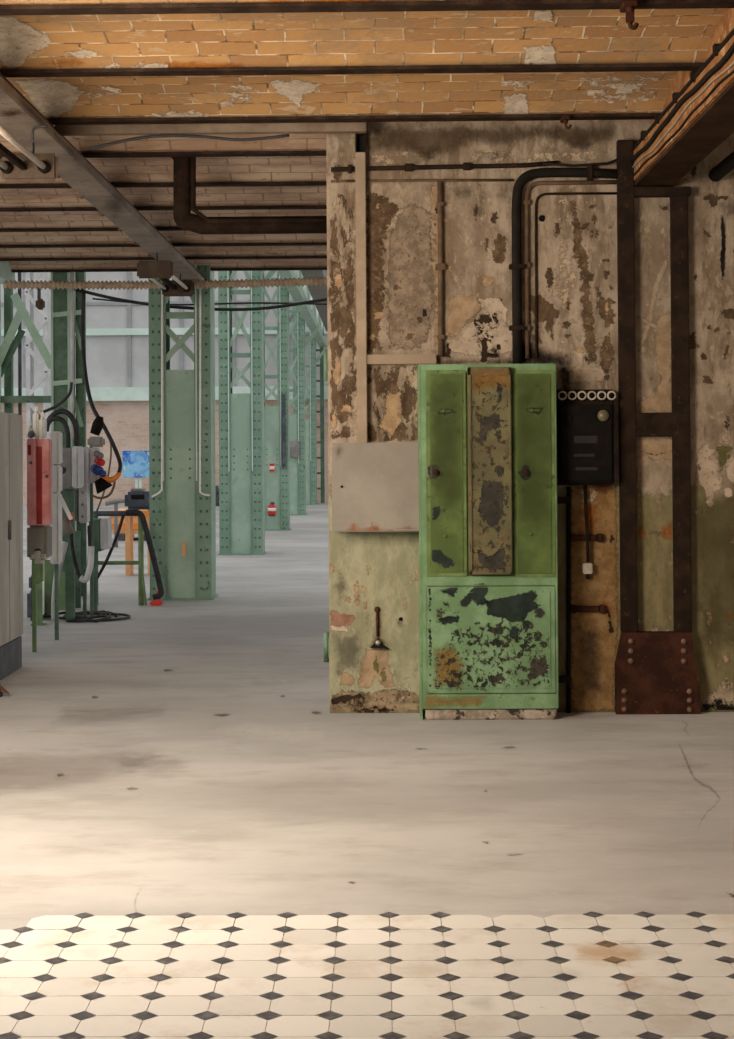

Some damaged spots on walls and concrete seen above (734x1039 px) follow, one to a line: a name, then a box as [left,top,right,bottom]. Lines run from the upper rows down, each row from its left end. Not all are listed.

peeling [0,16,122,118]
peeling [151,110,209,118]
peeling [214,80,323,107]
peeling [578,73,659,104]
peeling [328,186,512,441]
peeling [694,444,734,514]
spalling [330,565,370,632]